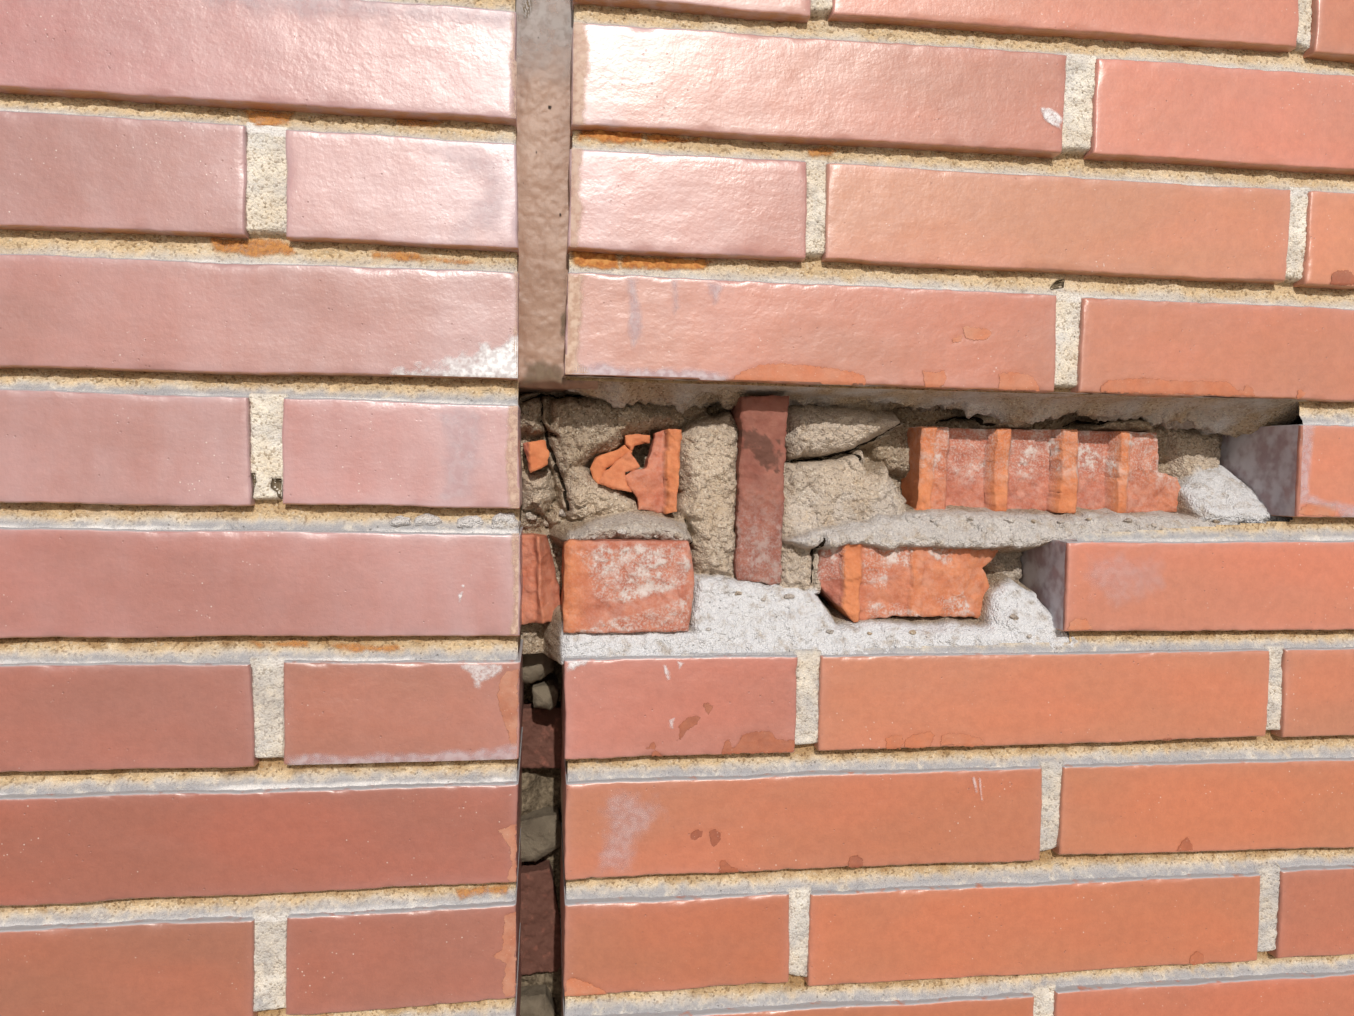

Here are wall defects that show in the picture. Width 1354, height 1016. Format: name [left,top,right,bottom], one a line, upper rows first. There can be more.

water stain [396,328,518,378]
spalling [389,363,1336,665]
spalling [497,669,519,756]
spalling [679,703,713,740]
spalling [721,731,795,755]
spalling [885,731,985,749]